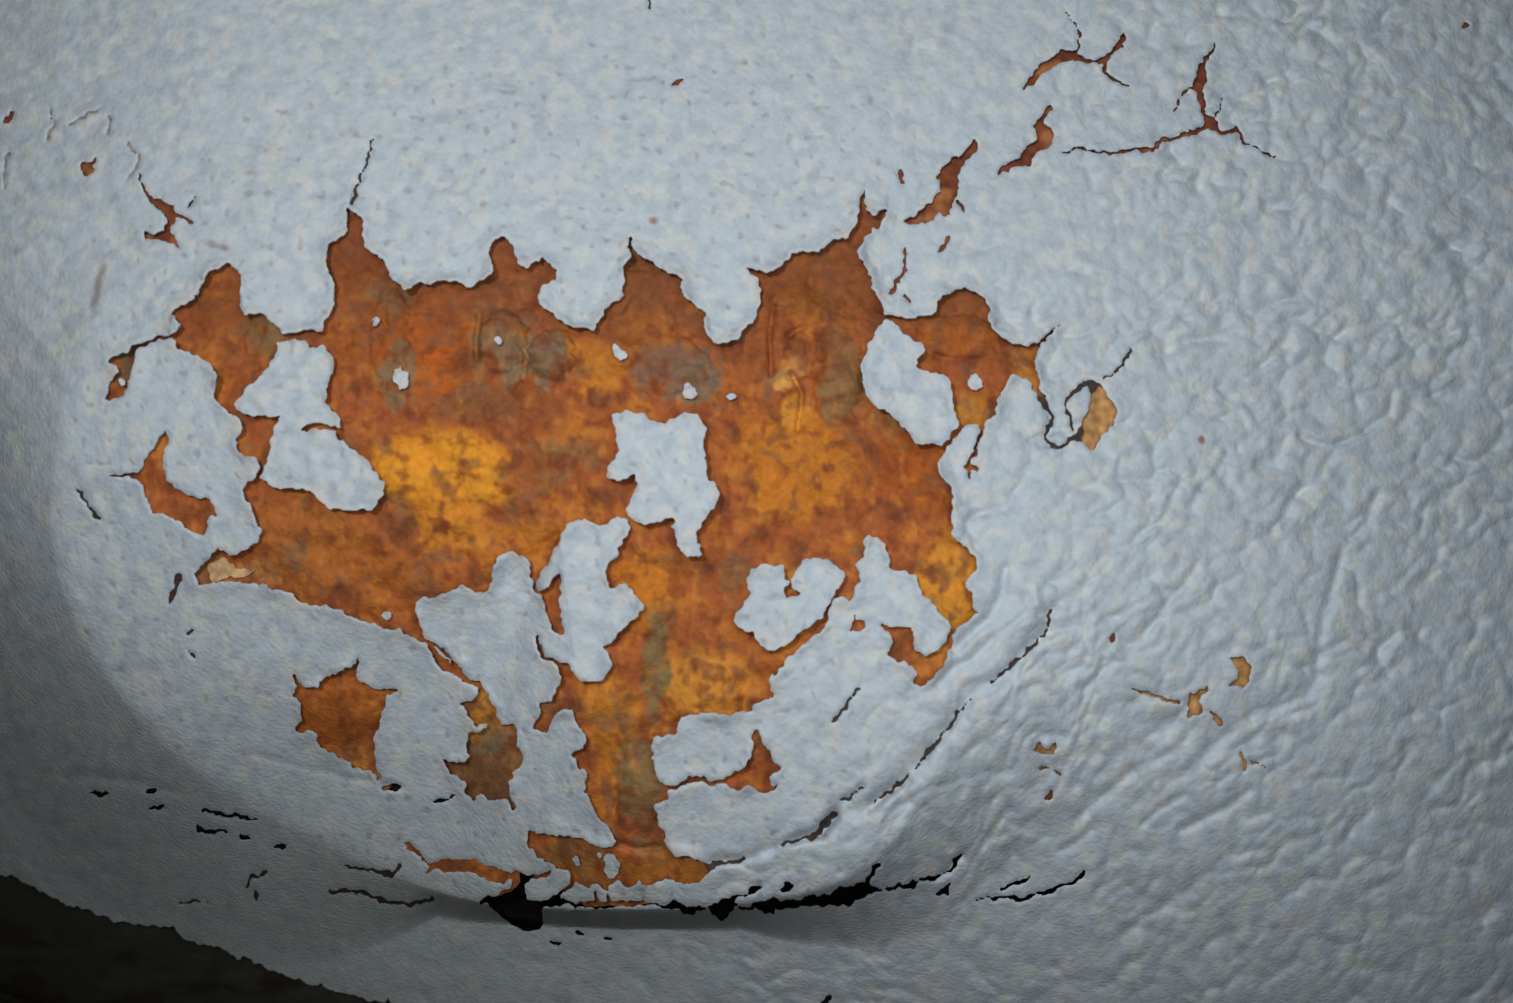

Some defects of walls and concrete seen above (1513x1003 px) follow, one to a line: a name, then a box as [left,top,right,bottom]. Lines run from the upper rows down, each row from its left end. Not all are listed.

peeling [106,191,1132,908]
peeling [1229,657,1251,688]
peeling [1132,687,1223,726]
crack [91,789,110,798]
crack [388,784,455,803]
crack [480,609,1085,946]
crack [146,788,287,901]
crack [179,897,208,905]
crack [328,863,434,908]
crack [821,995,832,1003]